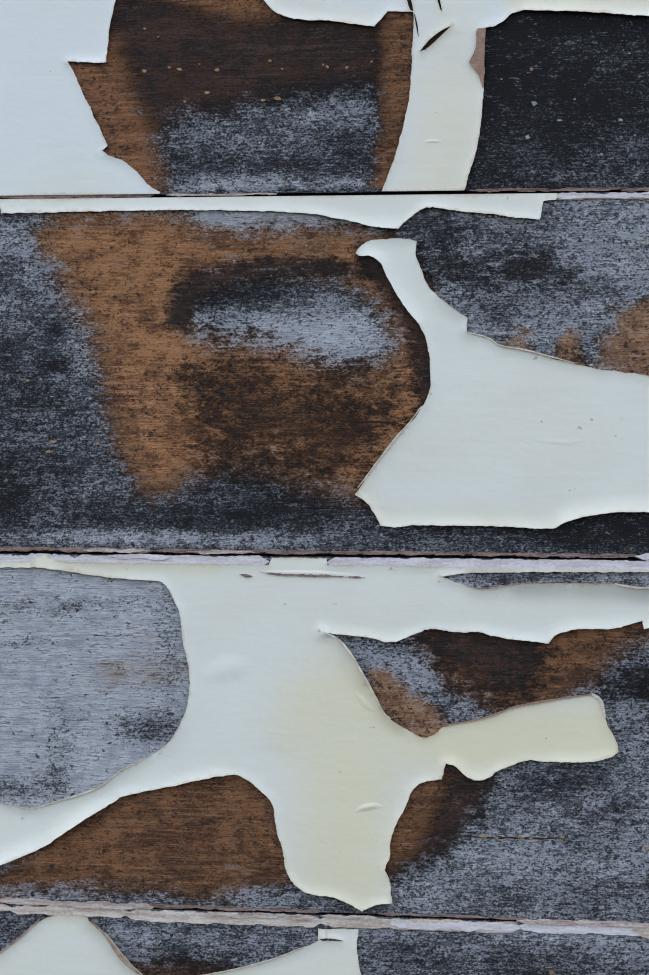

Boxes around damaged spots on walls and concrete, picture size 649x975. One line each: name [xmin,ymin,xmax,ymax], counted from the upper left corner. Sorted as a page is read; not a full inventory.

crack [407,0,449,51]
peeling [0,0,649,560]
peeling [0,553,649,975]